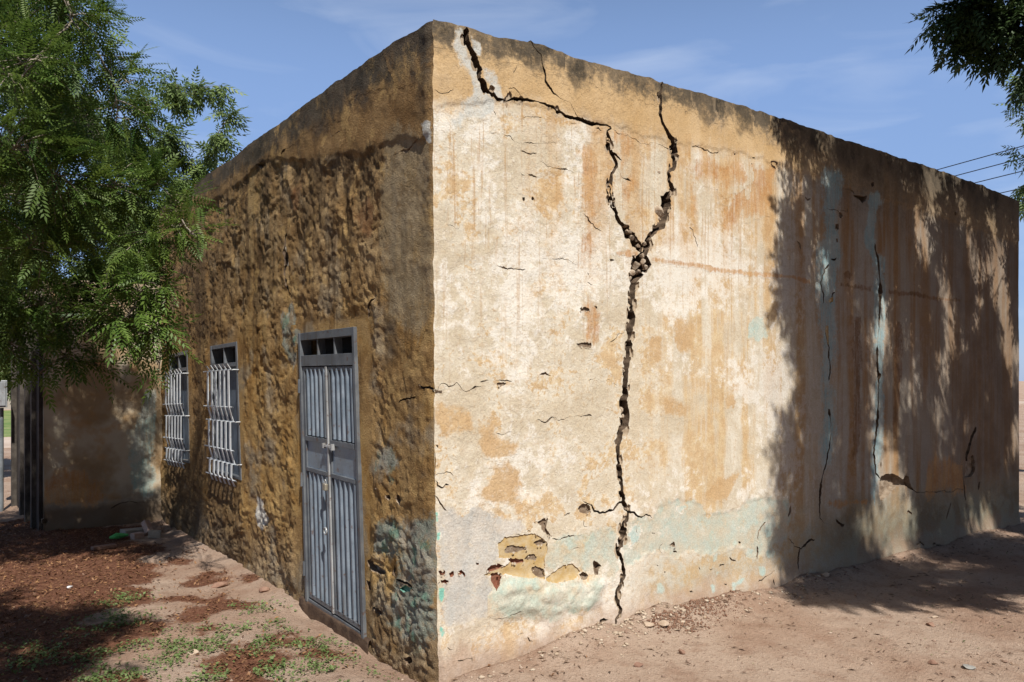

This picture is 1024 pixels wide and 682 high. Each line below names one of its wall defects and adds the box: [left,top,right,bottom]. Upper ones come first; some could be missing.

crack [460,27,718,624]
peeling [434,392,792,638]
peeling [641,312,702,372]
leakage [468,29,1015,515]
crack [699,409,844,585]
crack [820,258,836,304]
crack [873,244,883,478]
crack [906,427,980,519]